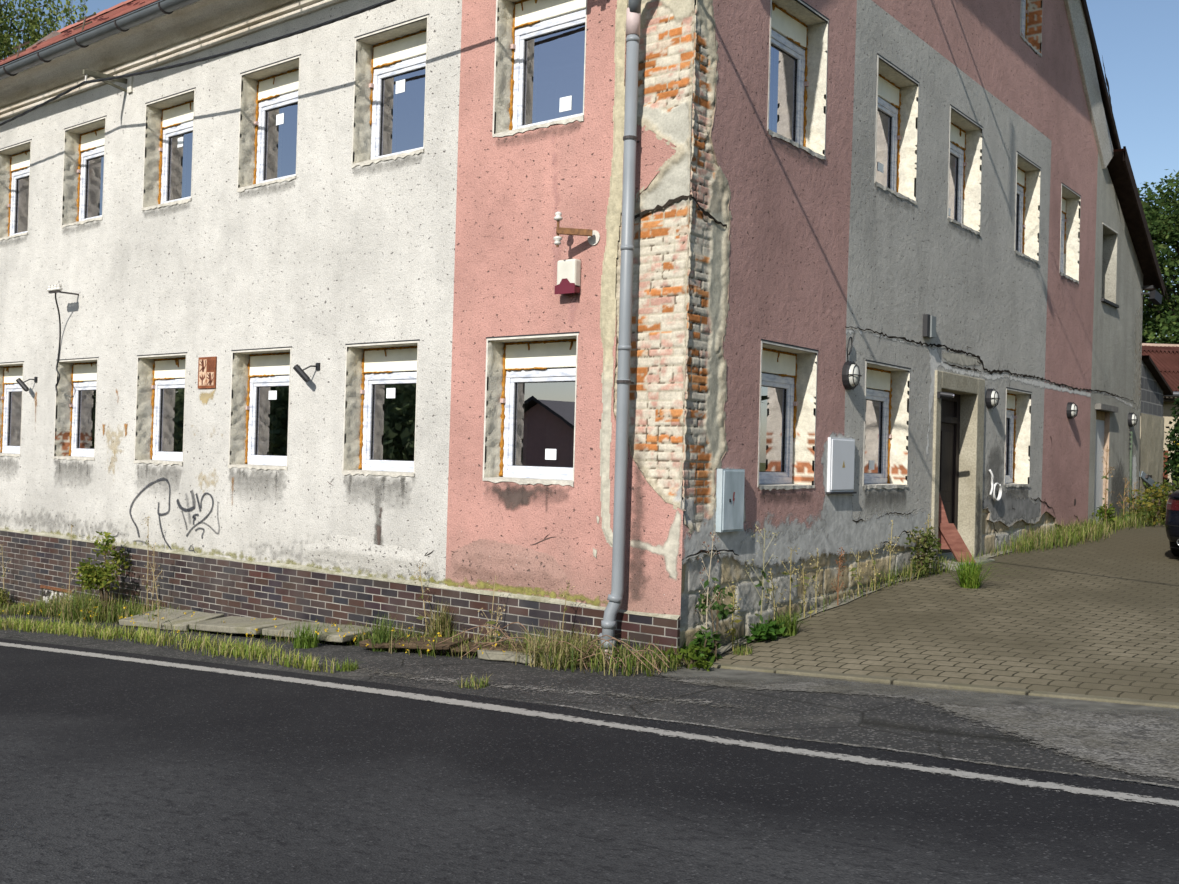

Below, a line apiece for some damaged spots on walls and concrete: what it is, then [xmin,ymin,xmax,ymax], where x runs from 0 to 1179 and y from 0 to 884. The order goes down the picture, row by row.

spalling [613,0,732,534]
crack [845,326,1136,404]
damp [495,486,551,510]
spalling [679,543,927,658]